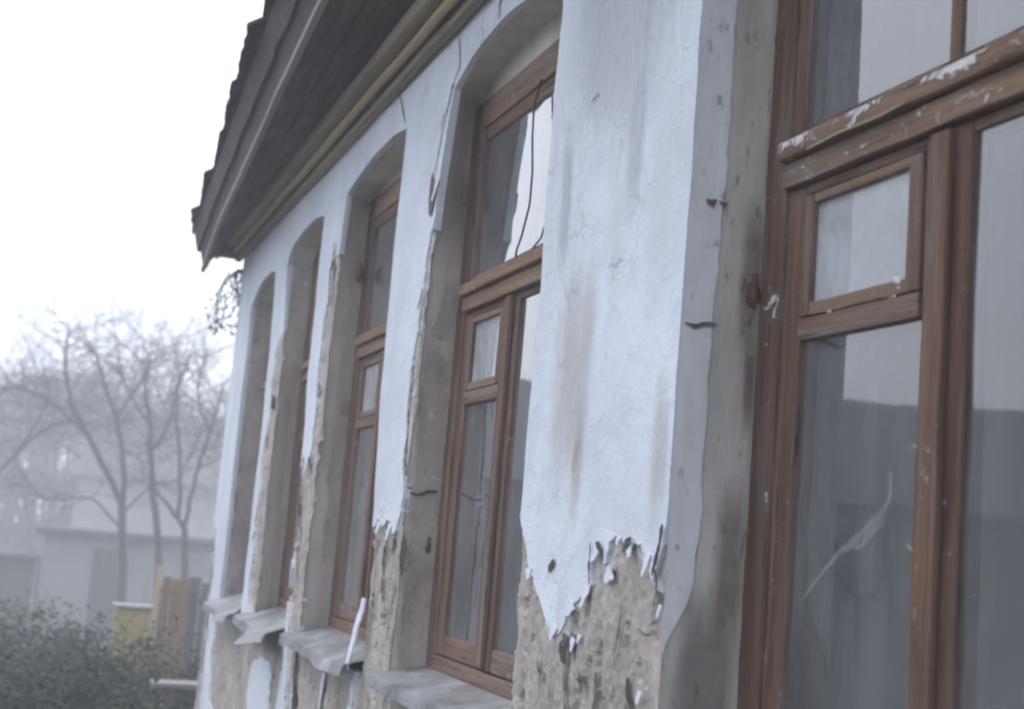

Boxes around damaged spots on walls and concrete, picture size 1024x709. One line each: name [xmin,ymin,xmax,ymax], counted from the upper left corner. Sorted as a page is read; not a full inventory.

peeling [906,41,992,87]
spalling [194,230,436,709]
spalling [511,0,906,709]